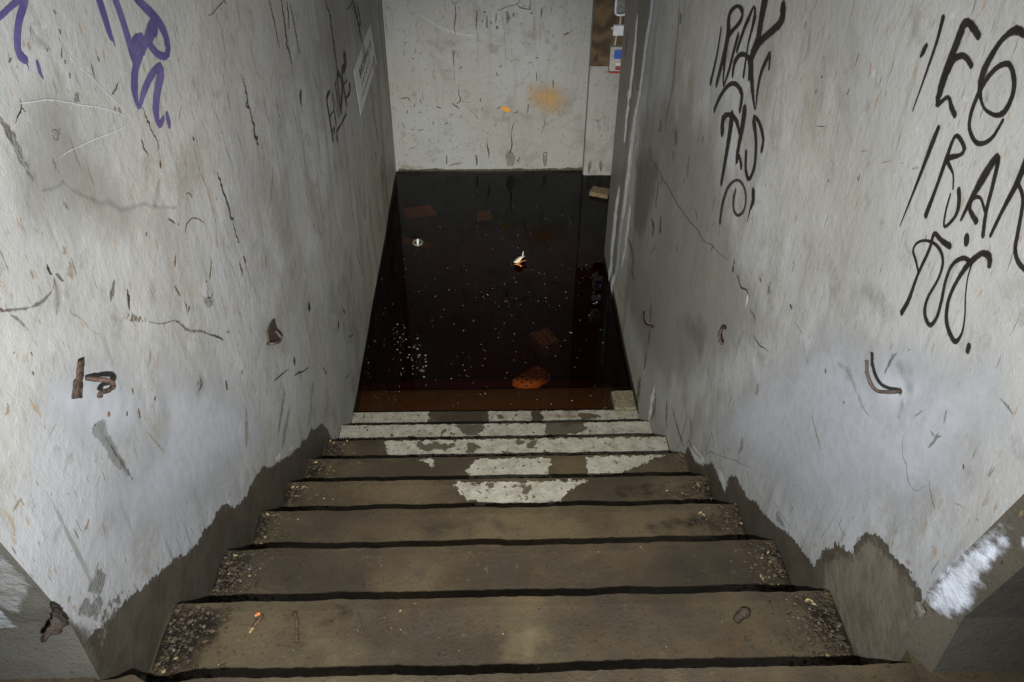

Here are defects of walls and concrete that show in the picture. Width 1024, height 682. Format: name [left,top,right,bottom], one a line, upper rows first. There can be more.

crack [151,321,229,340]
crack [651,159,767,351]
damp [69,424,337,680]
damp [602,254,1008,666]